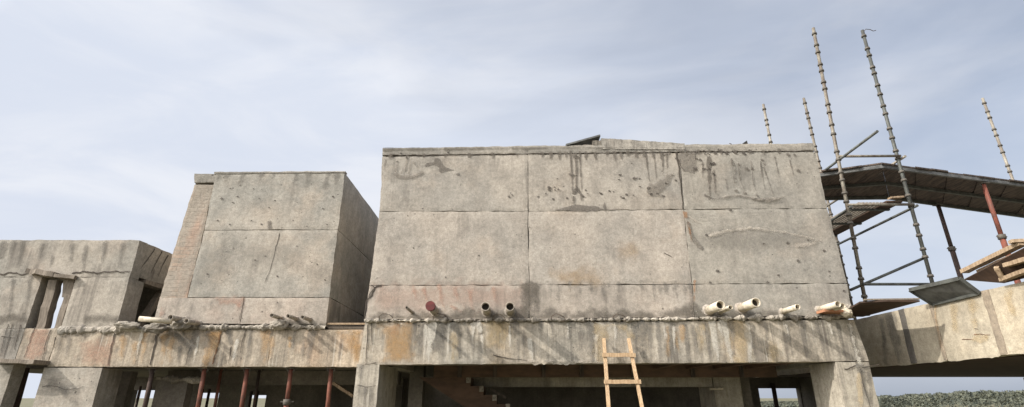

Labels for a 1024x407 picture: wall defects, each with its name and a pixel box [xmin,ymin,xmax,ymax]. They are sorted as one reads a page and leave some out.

water stain [511,147,801,203]
crack [72,249,169,274]
water stain [400,310,483,358]
water stain [490,282,774,361]